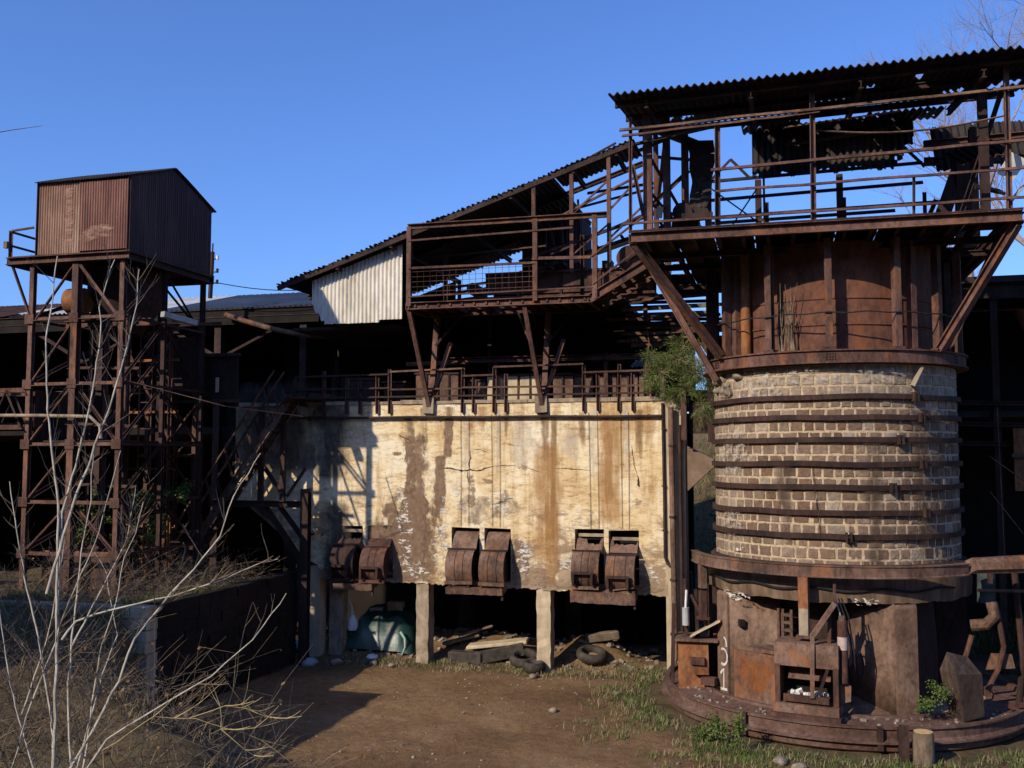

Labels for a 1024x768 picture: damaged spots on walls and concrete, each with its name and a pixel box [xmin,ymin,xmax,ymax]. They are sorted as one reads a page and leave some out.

leakage [368,418,454,582]
crack [444,444,583,479]
leakage [512,539,529,586]
rust [536,412,559,582]